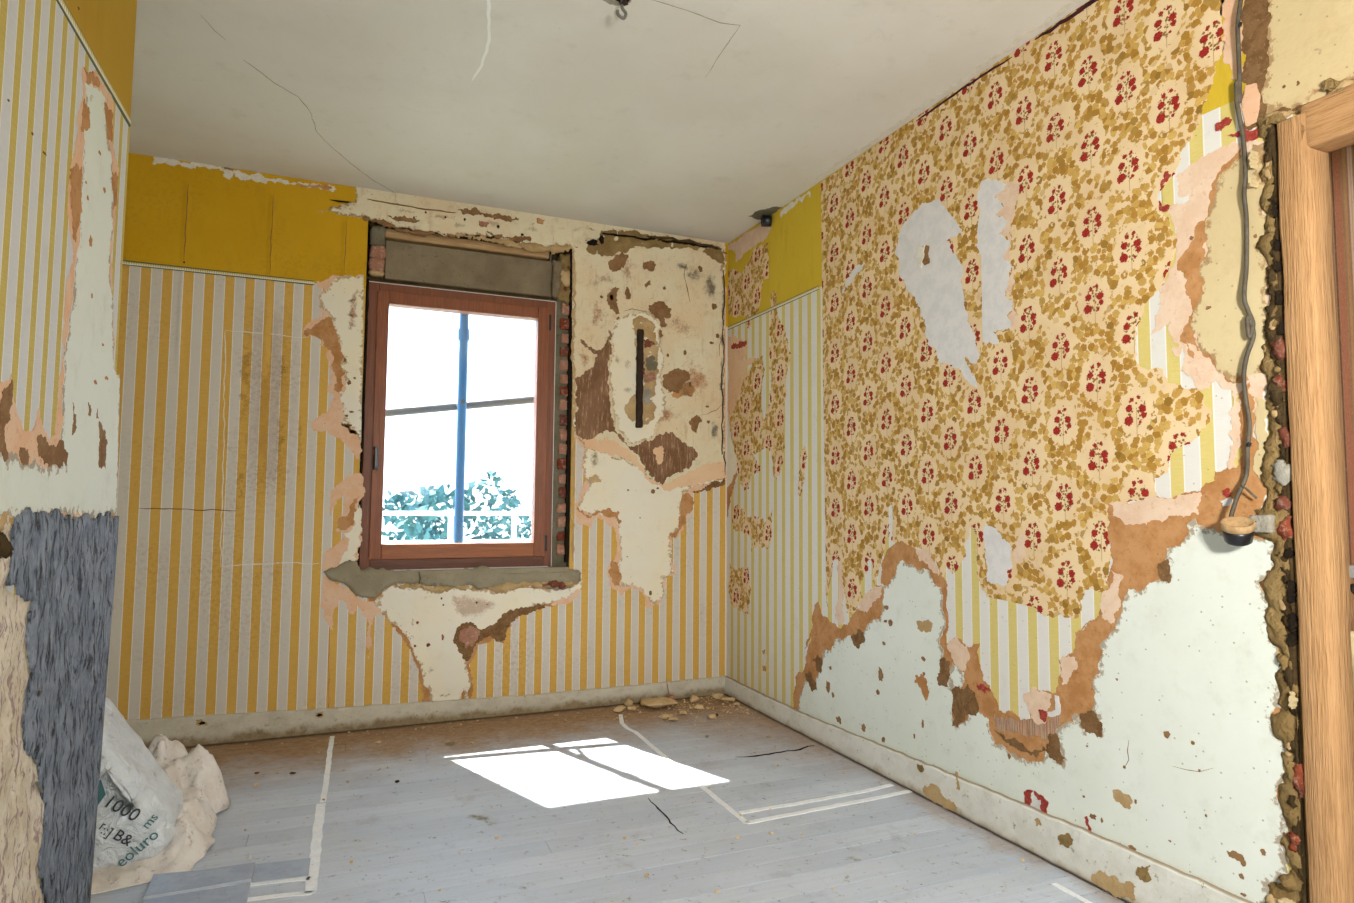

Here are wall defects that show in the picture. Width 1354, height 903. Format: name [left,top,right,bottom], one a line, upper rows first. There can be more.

crack [654,0,740,76]
crack [245,61,393,203]
flaking render [152,156,811,336]
flaking render [0,82,120,903]
flaking render [319,275,364,440]
flaking render [338,505,363,566]
flaking render [608,310,666,444]
flaking render [572,356,738,605]
flaking render [798,0,1354,903]
flaking render [374,579,583,701]